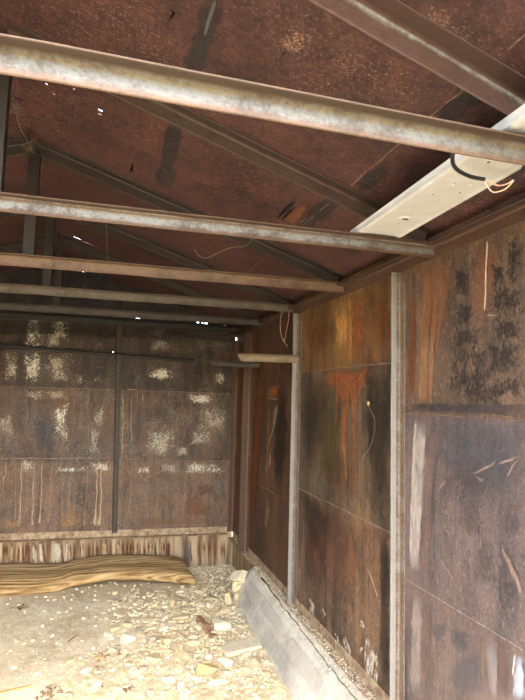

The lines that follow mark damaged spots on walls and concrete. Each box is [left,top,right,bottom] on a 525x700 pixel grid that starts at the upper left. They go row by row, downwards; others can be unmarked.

water stain [156,126,181,185]
rust [335,298,365,359]
rust [328,369,367,484]